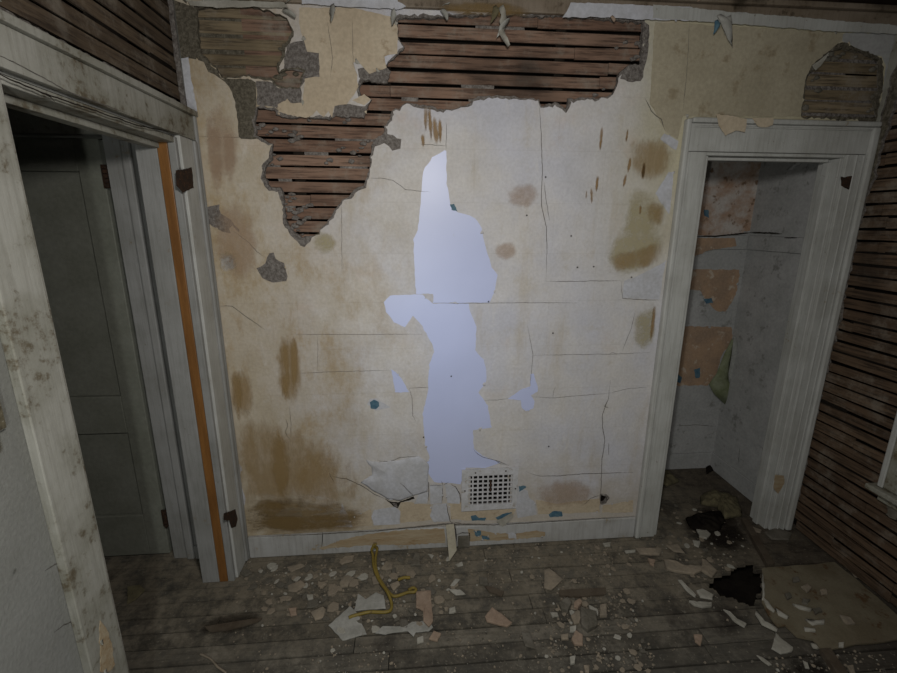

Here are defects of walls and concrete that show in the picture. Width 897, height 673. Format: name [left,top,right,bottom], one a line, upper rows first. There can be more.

flaking render [0,0,897,256]
flaking render [257,252,288,282]
flaking render [690,269,740,312]
crack [303,334,393,344]
flaking render [677,325,733,386]
leakage [245,435,359,531]
crack [263,380,644,543]